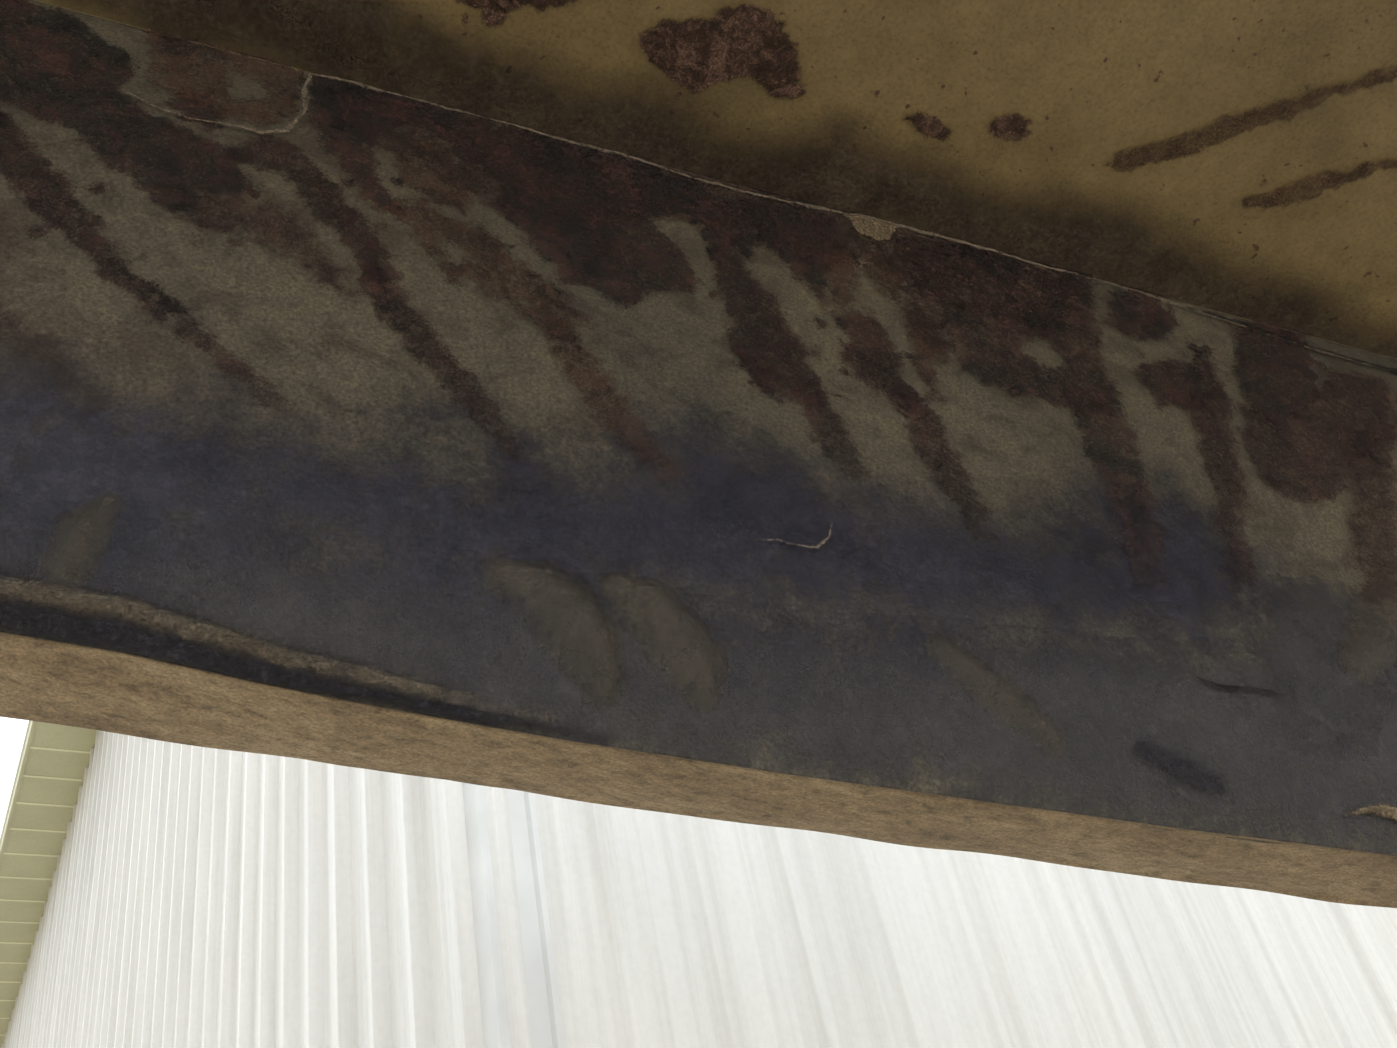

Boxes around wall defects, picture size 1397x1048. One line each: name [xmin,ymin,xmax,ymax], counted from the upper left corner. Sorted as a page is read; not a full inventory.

rust [0,107,283,403]
rust [222,133,517,449]
rust [456,0,576,28]
rust [637,4,806,100]
crack [125,73,1397,373]
rust [706,246,869,478]
rust [815,309,990,528]
rust [990,113,1033,142]
rust [1107,69,1397,172]
rust [1242,160,1397,209]
water stain [0,365,1397,852]
peeling [1351,804,1397,820]